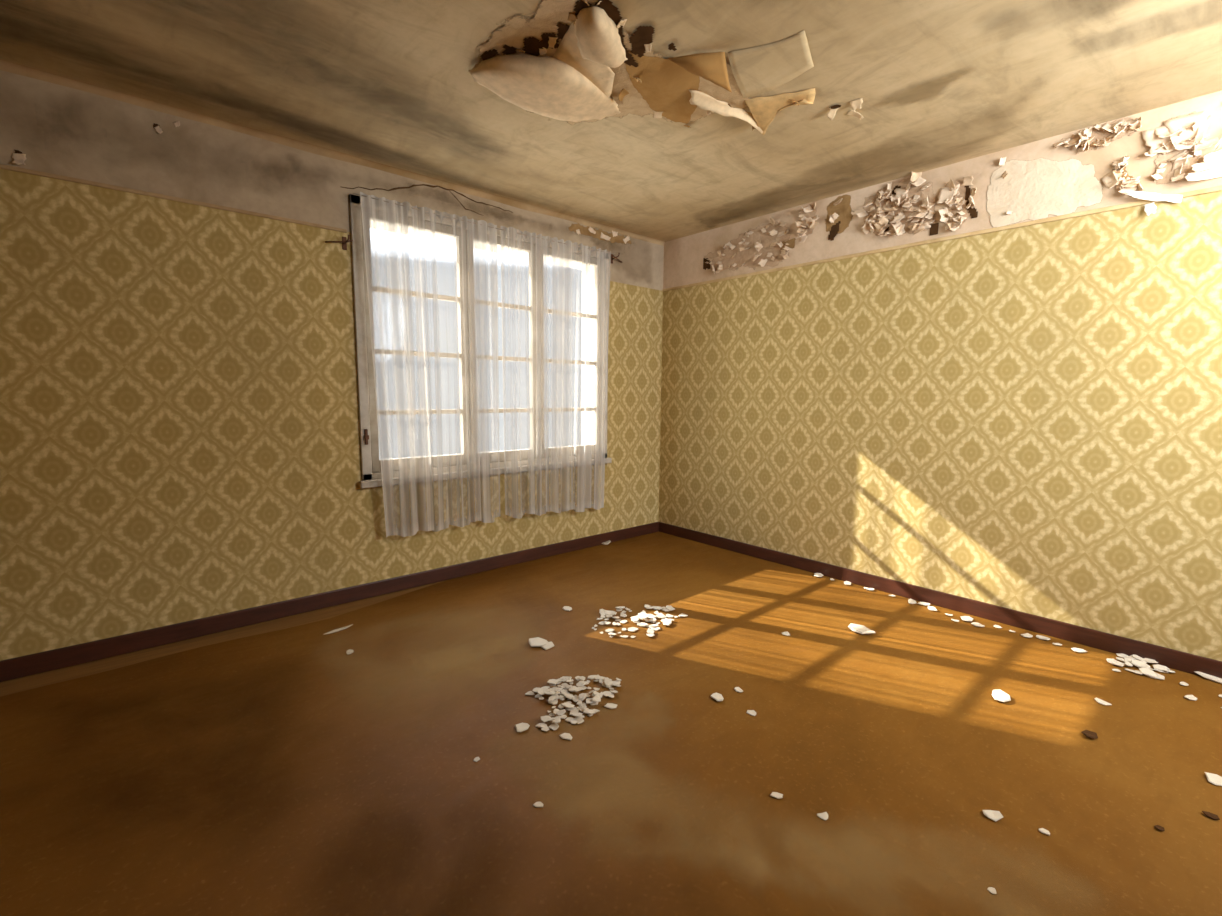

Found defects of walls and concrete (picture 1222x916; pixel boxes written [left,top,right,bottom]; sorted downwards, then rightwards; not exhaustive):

peeling [468,0,816,135]
peeling [827,98,864,120]
spalling [703,110,1222,274]